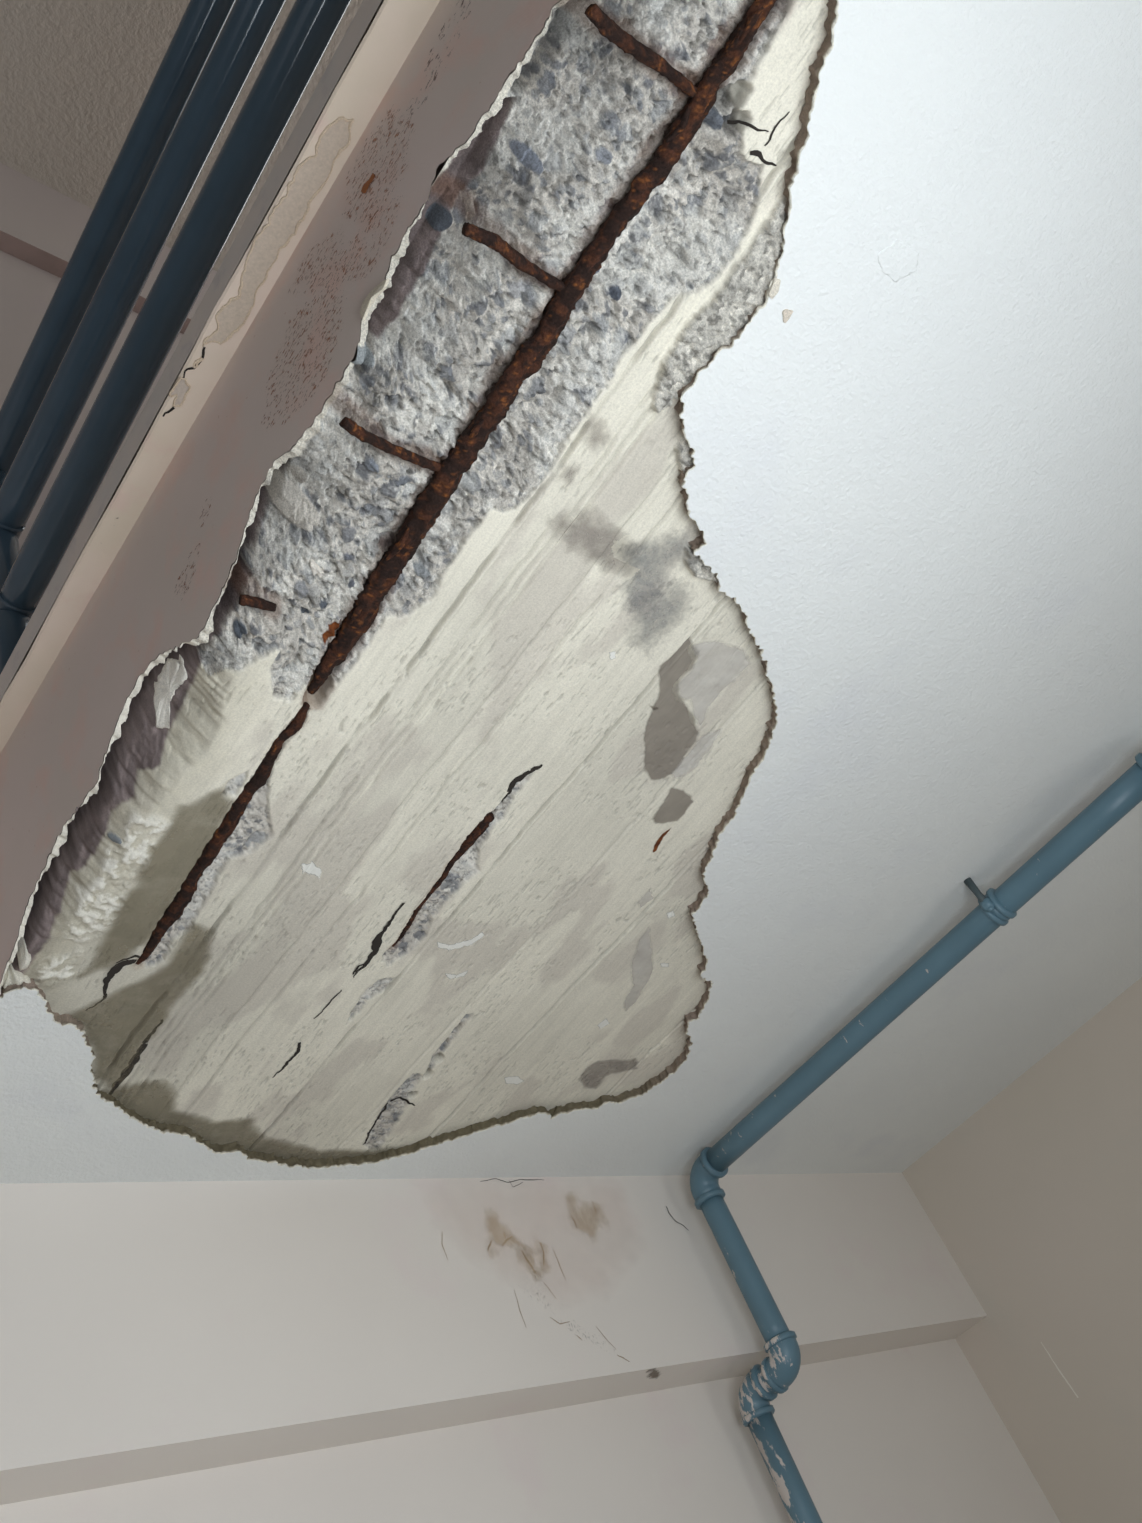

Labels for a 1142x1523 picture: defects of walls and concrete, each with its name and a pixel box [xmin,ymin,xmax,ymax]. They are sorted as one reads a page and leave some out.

crack [727,112,789,166]
corrosion [261,110,413,425]
corrosion [322,619,341,644]
spalling [0,0,839,1169]
damp [568,525,682,637]
crack [501,764,543,802]
damp [644,638,748,823]
crack [363,1097,415,1145]